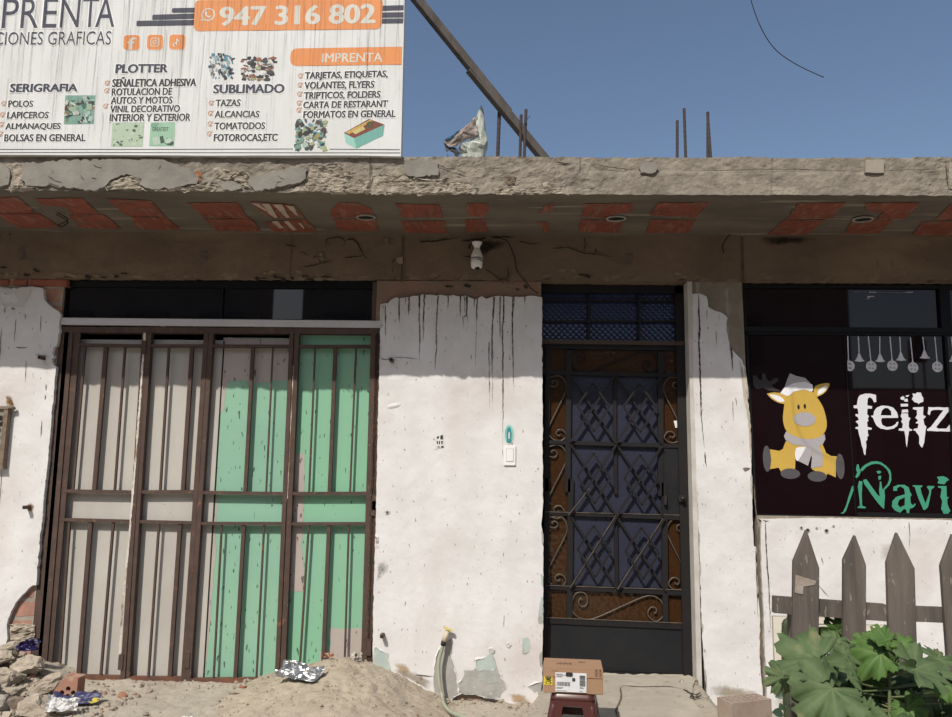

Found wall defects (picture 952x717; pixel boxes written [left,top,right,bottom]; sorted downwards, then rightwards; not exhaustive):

spalling [8,162,40,193]
spalling [105,167,251,193]
peeling [0,265,40,310]
leakage [398,295,425,354]
leakage [435,296,478,358]
leakage [488,296,525,399]
peeling [373,645,391,670]
peeling [433,637,542,700]